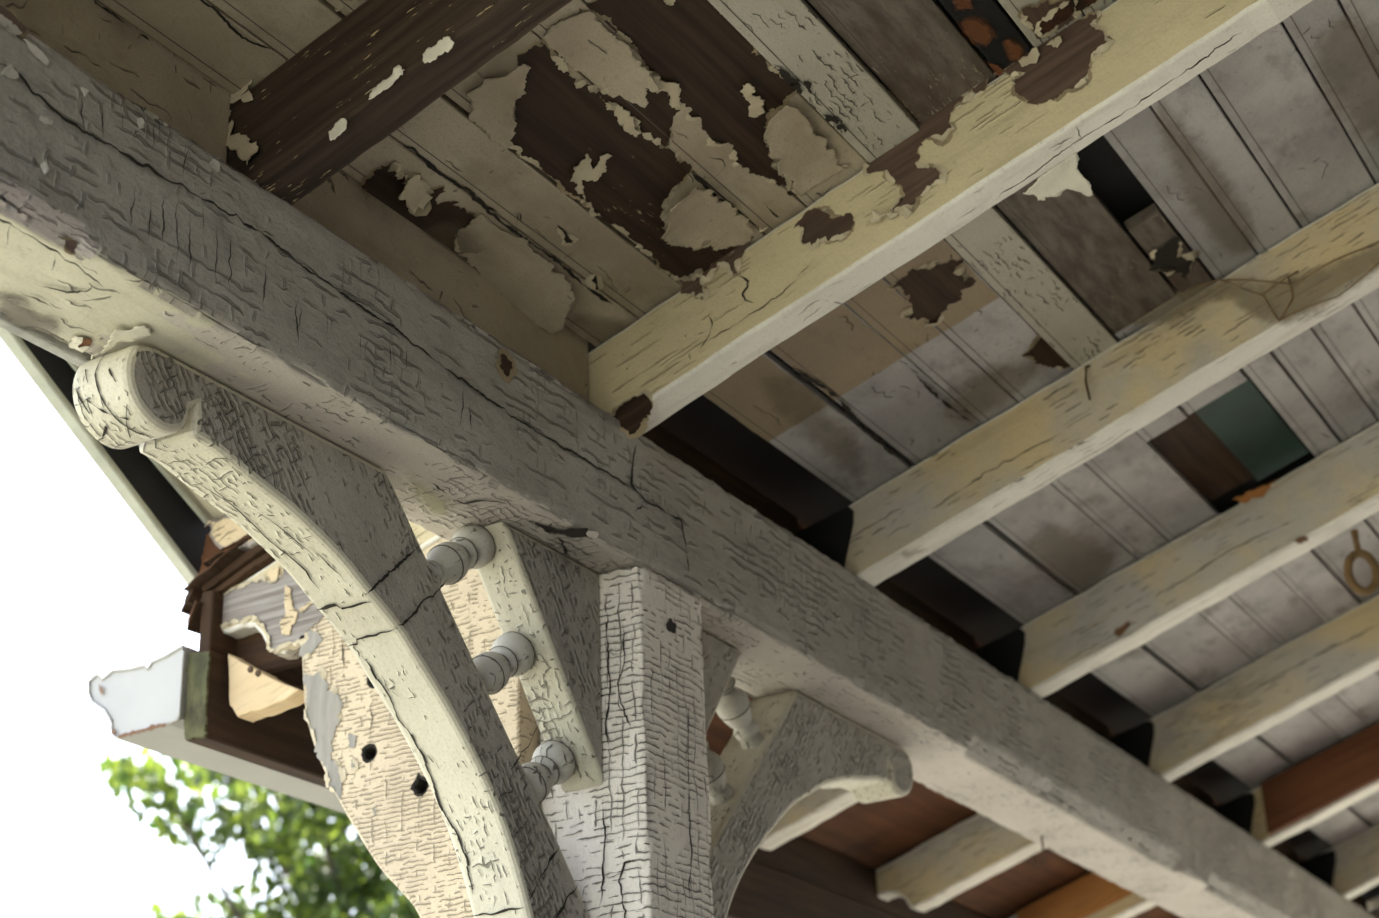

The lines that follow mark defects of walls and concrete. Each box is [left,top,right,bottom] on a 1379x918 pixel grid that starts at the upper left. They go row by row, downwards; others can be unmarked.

crack [200,0,275,50]
peeling [329,118,347,141]
peeling [369,65,405,100]
peeling [422,36,455,63]
peeling [466,0,1115,302]
crack [0,64,689,585]
peeling [359,160,604,335]
peeling [220,567,359,799]
crack [340,644,473,894]
crack [599,796,639,918]
crack [605,616,638,747]
crack [684,709,693,899]